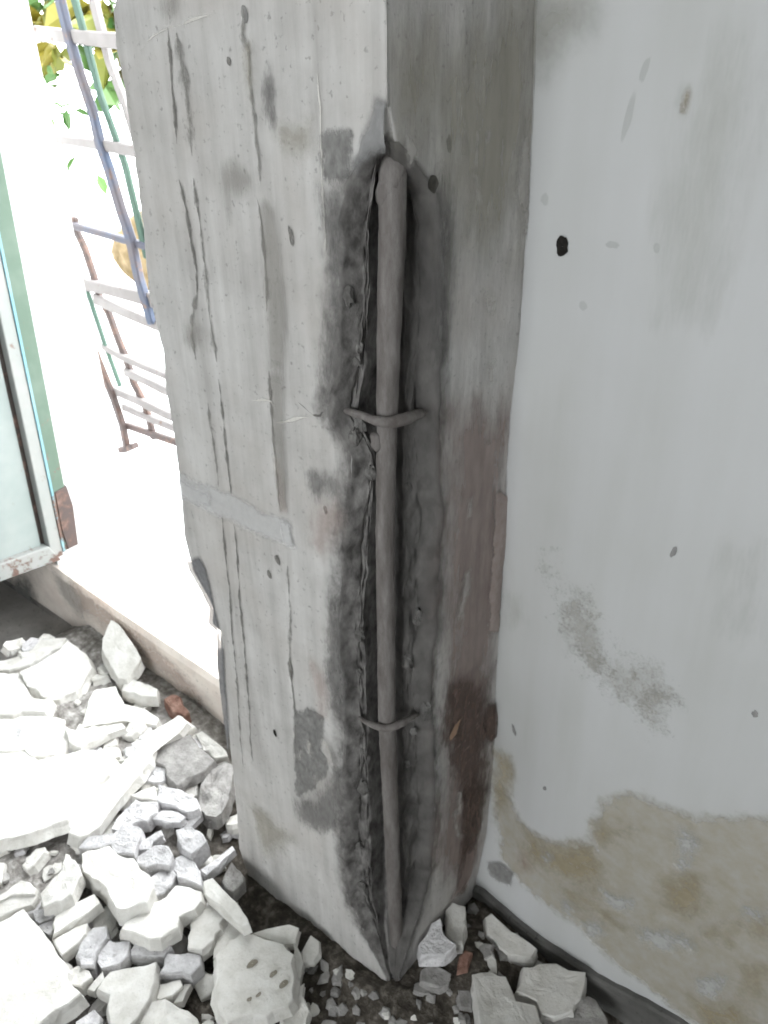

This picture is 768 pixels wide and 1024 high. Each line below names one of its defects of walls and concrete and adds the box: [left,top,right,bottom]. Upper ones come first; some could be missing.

leakage [295,769,337,831]
spalling [293,130,450,981]
corrosion [440,411,506,895]
leakage [495,757,768,1024]